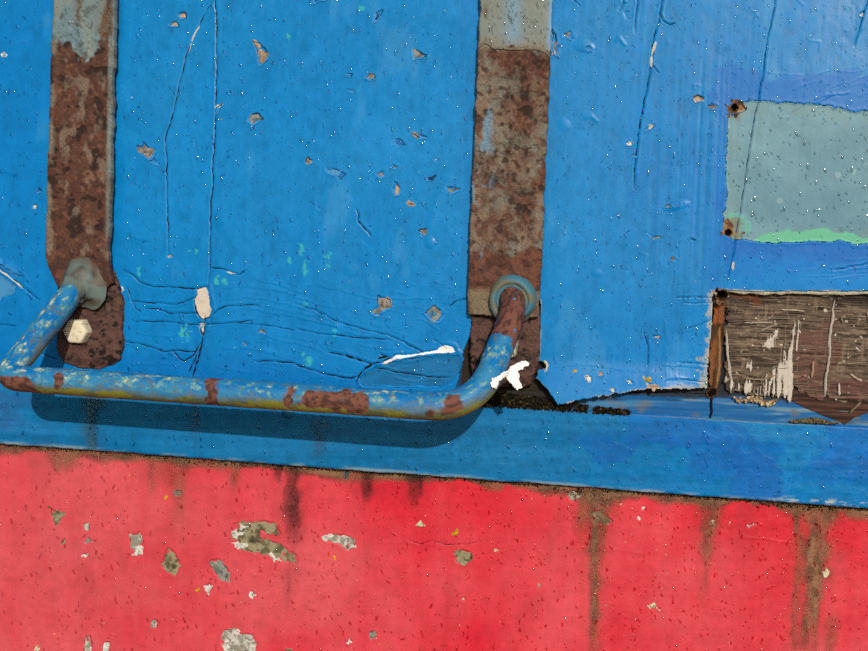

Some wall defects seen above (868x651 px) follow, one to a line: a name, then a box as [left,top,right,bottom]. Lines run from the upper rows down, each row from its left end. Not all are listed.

crack [620,0,675,181]
crack [126,0,451,382]
peeling [692,95,868,244]
crack [0,268,41,301]
peeling [194,287,211,335]
peeling [724,290,868,403]
peeling [129,533,144,556]
peeling [231,520,298,565]
peeling [322,533,357,550]
damp [782,502,804,536]
peeling [203,558,230,595]
peeling [221,628,258,651]